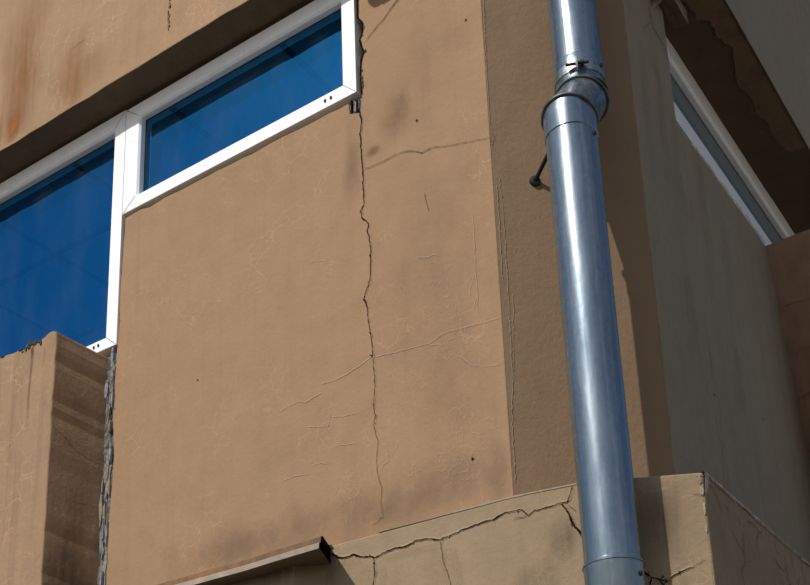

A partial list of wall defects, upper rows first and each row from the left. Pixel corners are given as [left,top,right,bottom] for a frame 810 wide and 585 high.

spalling [350,0,366,114]
spalling [659,0,689,28]
crack [282,107,499,524]
crack [331,486,581,585]
crack [644,559,708,585]